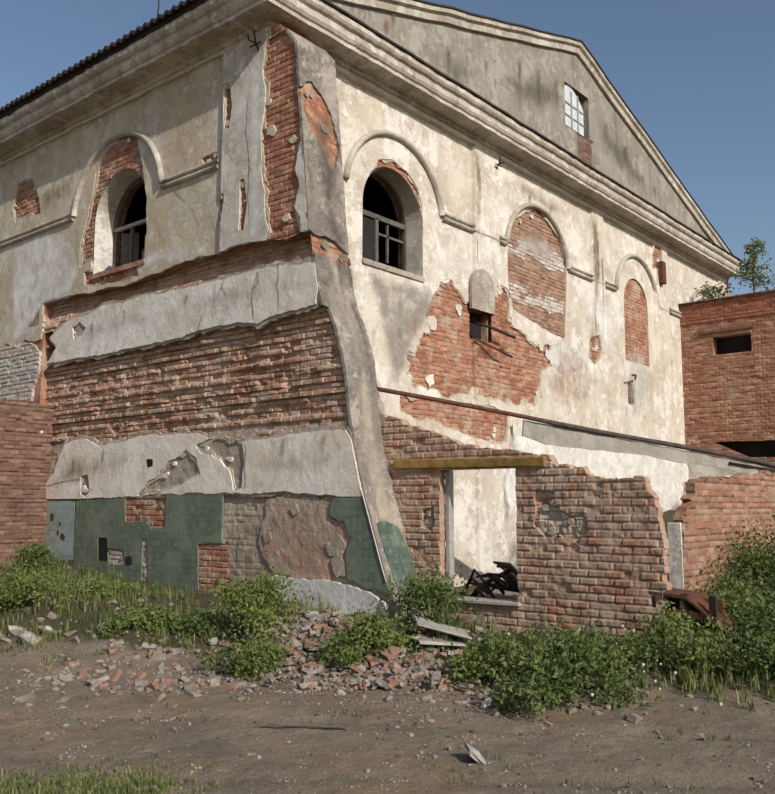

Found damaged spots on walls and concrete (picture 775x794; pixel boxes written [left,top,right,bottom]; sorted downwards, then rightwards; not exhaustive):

peeling [12,136,185,341]
spalling [47,23,348,368]
spalling [519,209,545,224]
spalling [399,259,685,516]
spalling [46,426,362,583]
spalling [198,540,233,593]